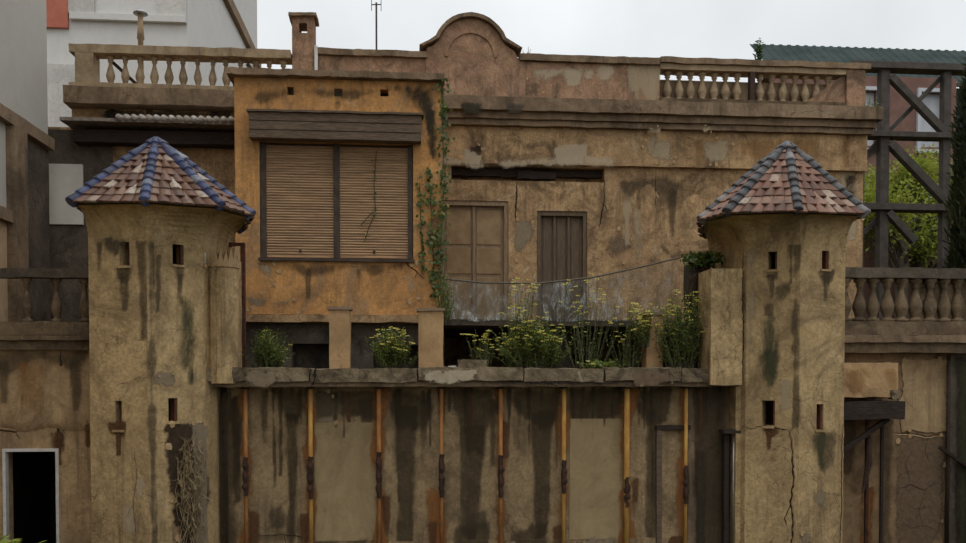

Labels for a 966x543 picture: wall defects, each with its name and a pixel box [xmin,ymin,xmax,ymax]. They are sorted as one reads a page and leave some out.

leakage [397,87,482,168]
leakage [502,144,612,167]
leakage [177,269,193,381]
leakage [749,274,800,425]
leakage [262,389,432,543]
corrosion [427,489,447,543]
leakage [448,387,622,543]
crack [741,418,797,543]
leakage [814,421,855,473]
crack [893,433,945,529]